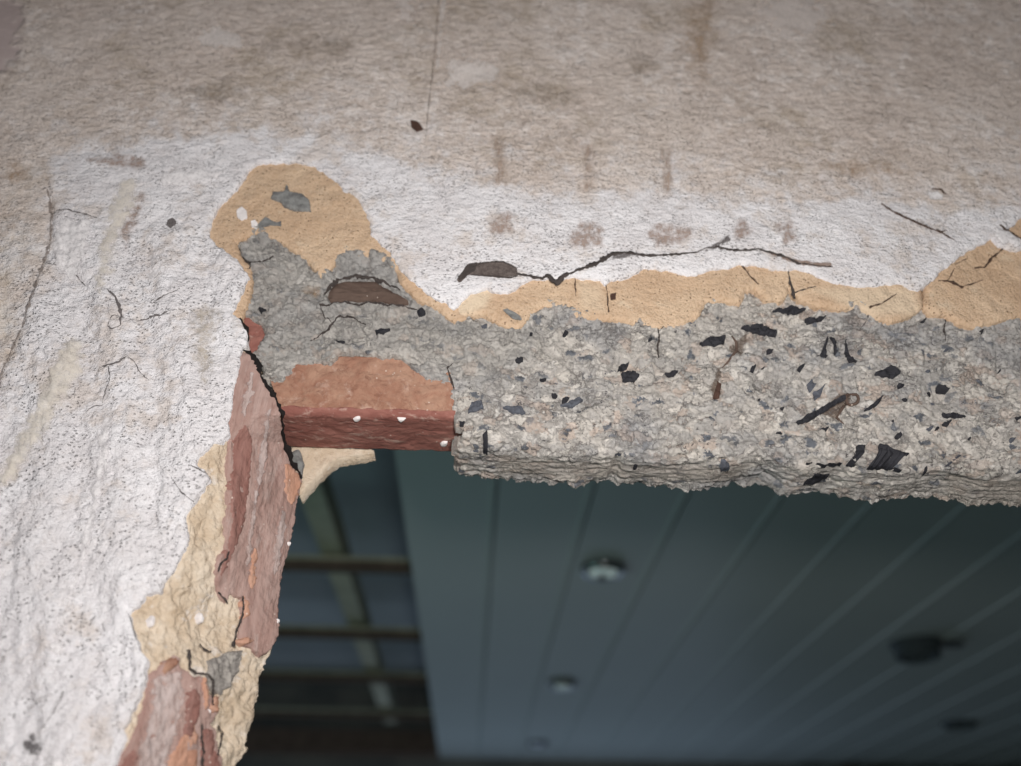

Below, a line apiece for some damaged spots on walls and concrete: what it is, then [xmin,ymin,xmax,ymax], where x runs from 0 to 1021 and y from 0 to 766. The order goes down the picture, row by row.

spalling [210,163,1021,331]
crack [457,234,833,312]
crack [656,326,664,358]
flaking render [117,655,222,766]